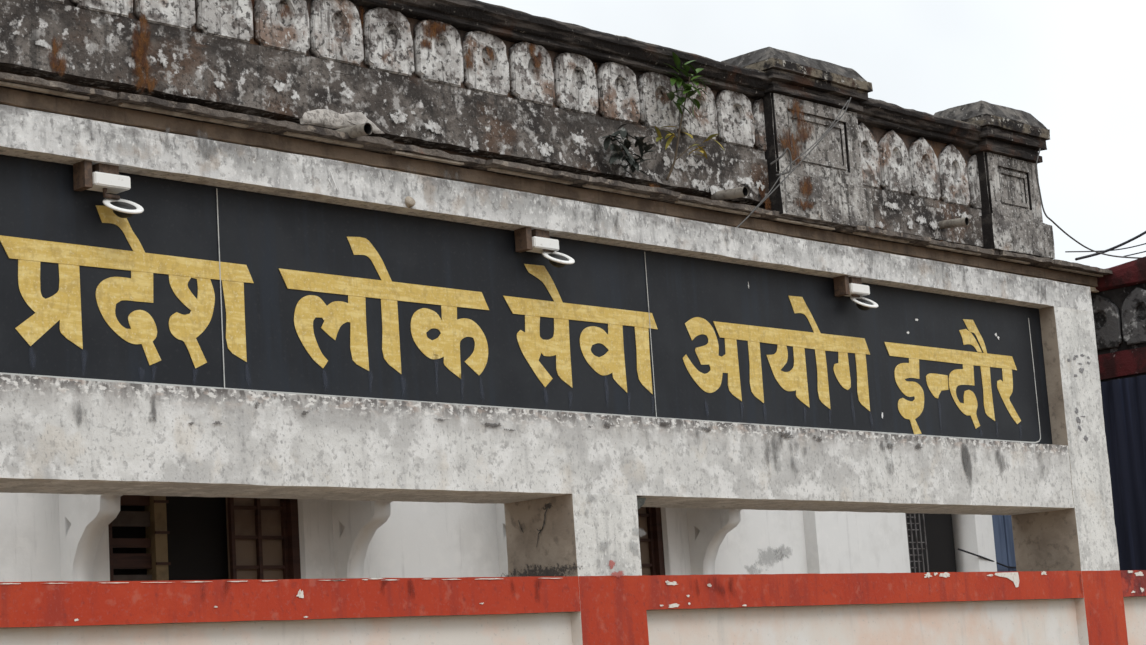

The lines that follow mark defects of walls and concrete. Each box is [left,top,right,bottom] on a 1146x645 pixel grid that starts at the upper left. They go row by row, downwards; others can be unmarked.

corrosion [49,38,67,76]
corrosion [132,1,158,92]
corrosion [781,100,813,165]
corrosion [796,176,814,210]
leakage [962,444,972,482]
crack [518,507,548,547]